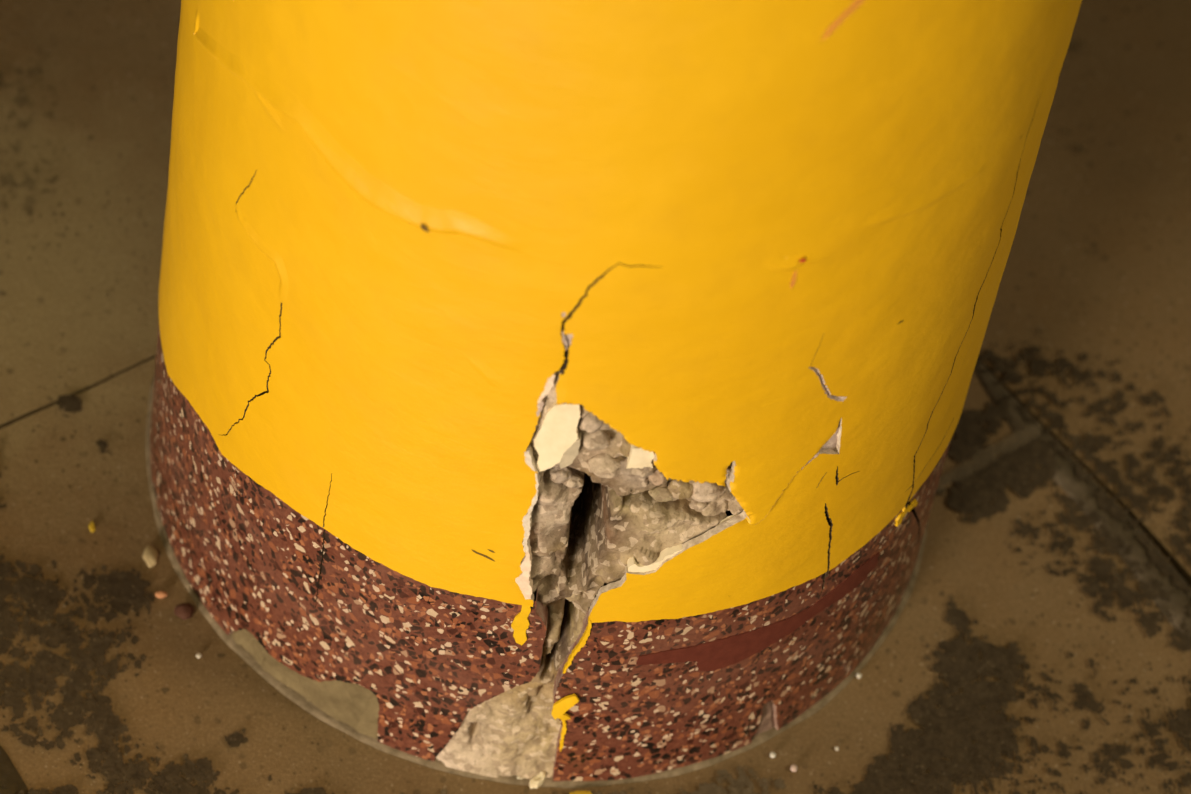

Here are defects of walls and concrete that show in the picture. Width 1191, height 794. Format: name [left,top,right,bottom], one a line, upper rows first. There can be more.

crack [221,302,283,436]
crack [558,263,658,375]
crack [904,93,1041,542]
peeling [792,425,839,479]
spalling [436,371,744,789]
crack [817,466,859,598]